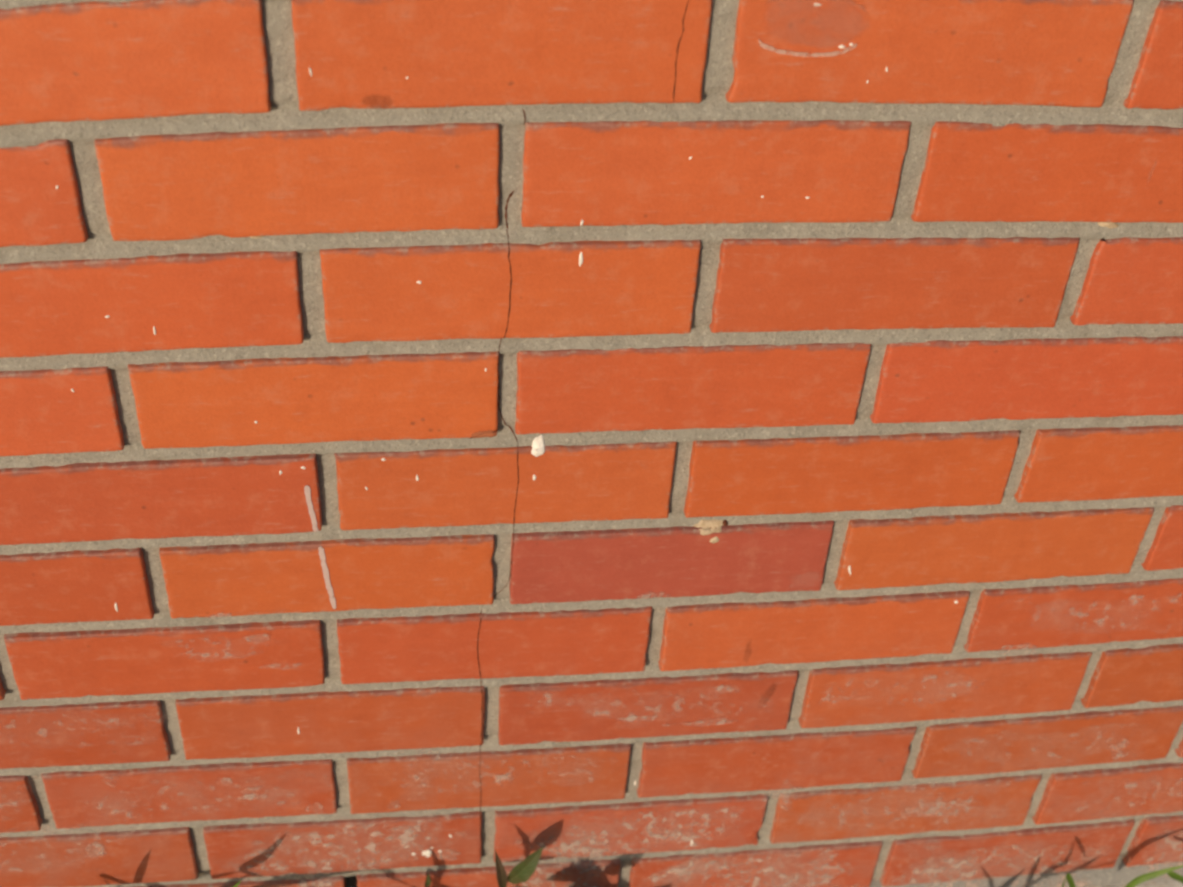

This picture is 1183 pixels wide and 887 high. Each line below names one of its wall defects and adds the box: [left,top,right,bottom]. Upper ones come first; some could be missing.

crack [673,3,688,100]
crack [477,191,519,856]